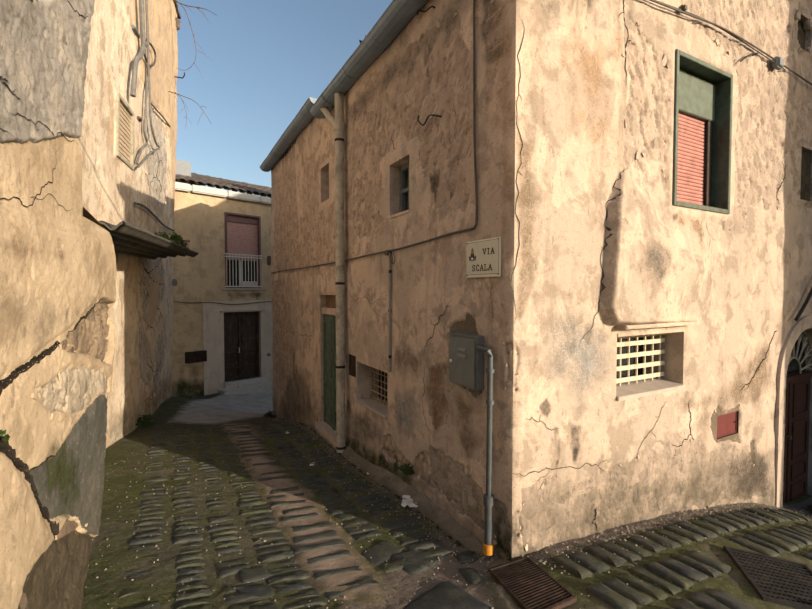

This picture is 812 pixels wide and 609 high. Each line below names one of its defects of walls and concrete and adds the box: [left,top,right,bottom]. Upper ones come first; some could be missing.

crack [619,0,634,84]
crack [0,76,74,211]
flaking render [344,8,473,276]
crack [490,21,525,332]
crack [0,298,106,396]
spalling [31,299,110,421]
flaking render [138,257,166,392]
flaking render [273,281,295,397]
spalling [449,313,479,335]
crack [0,435,59,539]
flaking render [429,404,773,558]
crack [632,400,694,462]